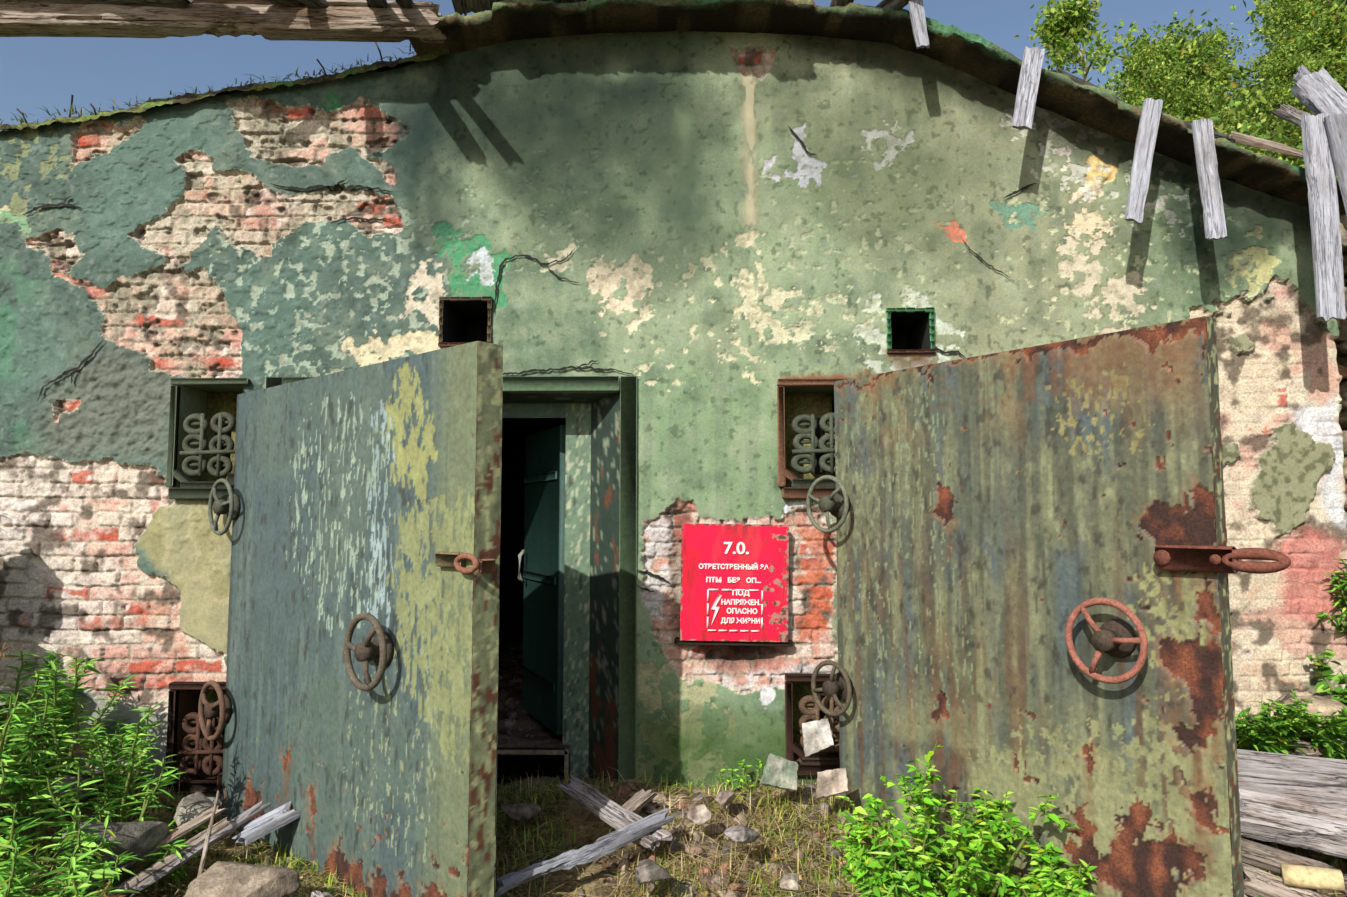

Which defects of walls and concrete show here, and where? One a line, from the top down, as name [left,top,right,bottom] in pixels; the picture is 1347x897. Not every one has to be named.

water stain [742,72,757,227]
crack [493,247,579,315]
peeling [540,241,655,331]
peeling [717,229,889,373]
corrosion [786,316,1207,396]
spalling [0,89,513,874]
spalling [636,353,976,784]
spalling [965,224,1347,897]
corrosion [1136,482,1217,546]
corrosion [1159,575,1225,753]
corrosion [314,811,469,897]
corrosion [1064,791,1208,897]